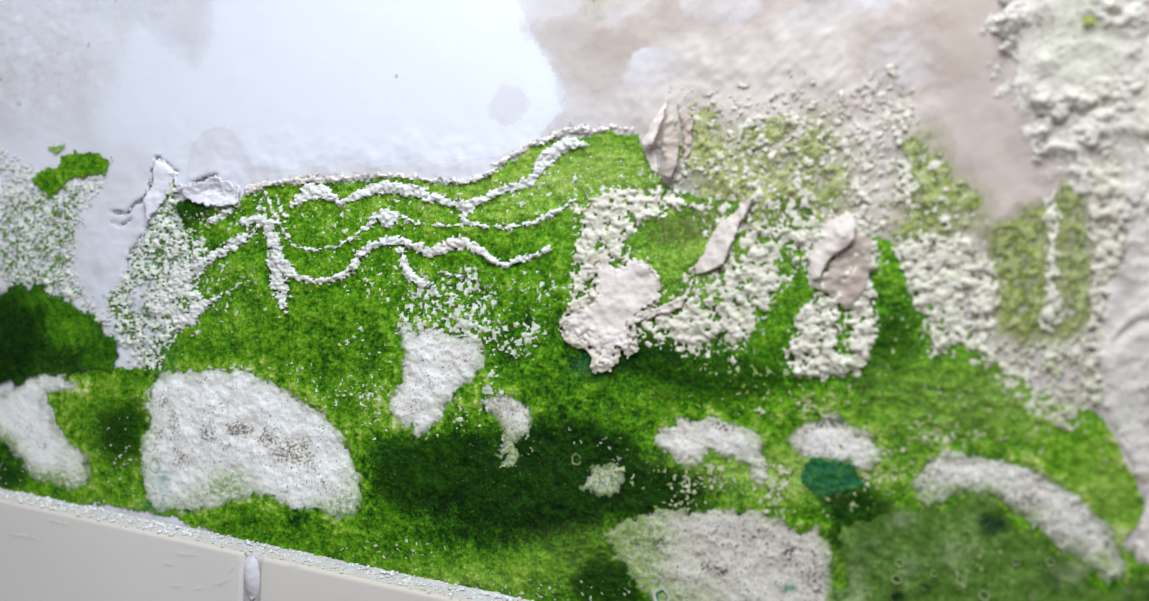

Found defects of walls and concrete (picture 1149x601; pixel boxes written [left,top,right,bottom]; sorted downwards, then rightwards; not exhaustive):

peeling [143,158,240,221]
leakage [268,323,392,440]
leakage [433,366,516,437]
leakage [0,0,1080,371]
spalling [558,0,1149,601]
leakage [959,192,1149,502]